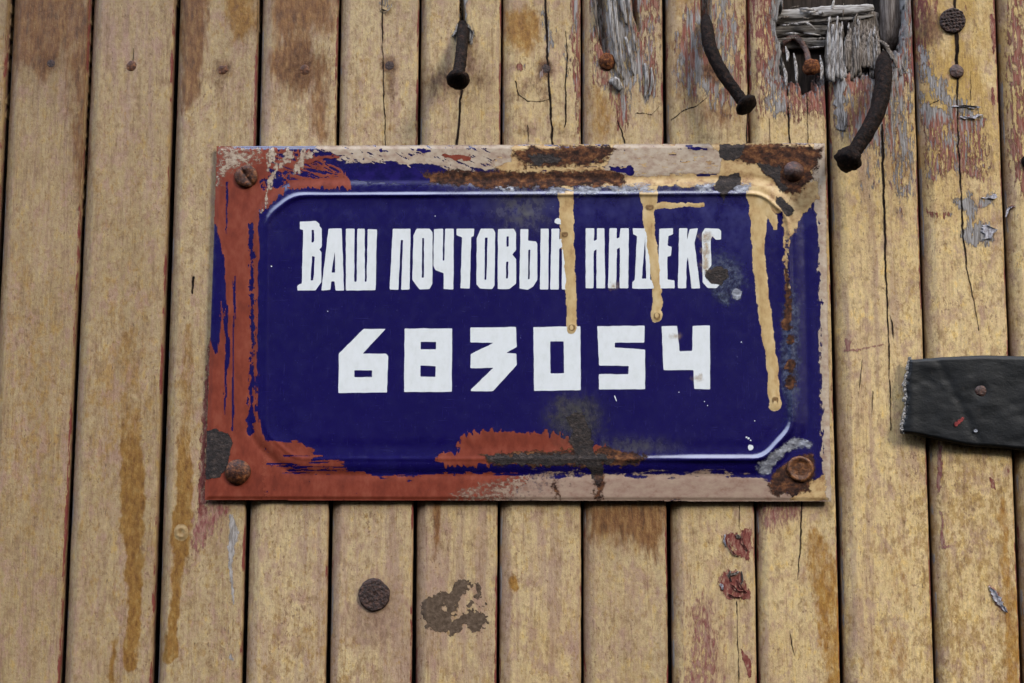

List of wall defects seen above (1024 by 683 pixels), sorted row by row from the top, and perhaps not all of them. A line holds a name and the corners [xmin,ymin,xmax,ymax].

crack [515,0,568,145]
peeling [540,0,875,144]
crack [858,124,894,431]
peeling [860,0,1024,248]
crack [930,0,979,330]
water stain [106,327,150,683]
water stain [160,320,199,667]
peeling [420,579,489,637]
peeling [718,501,803,600]